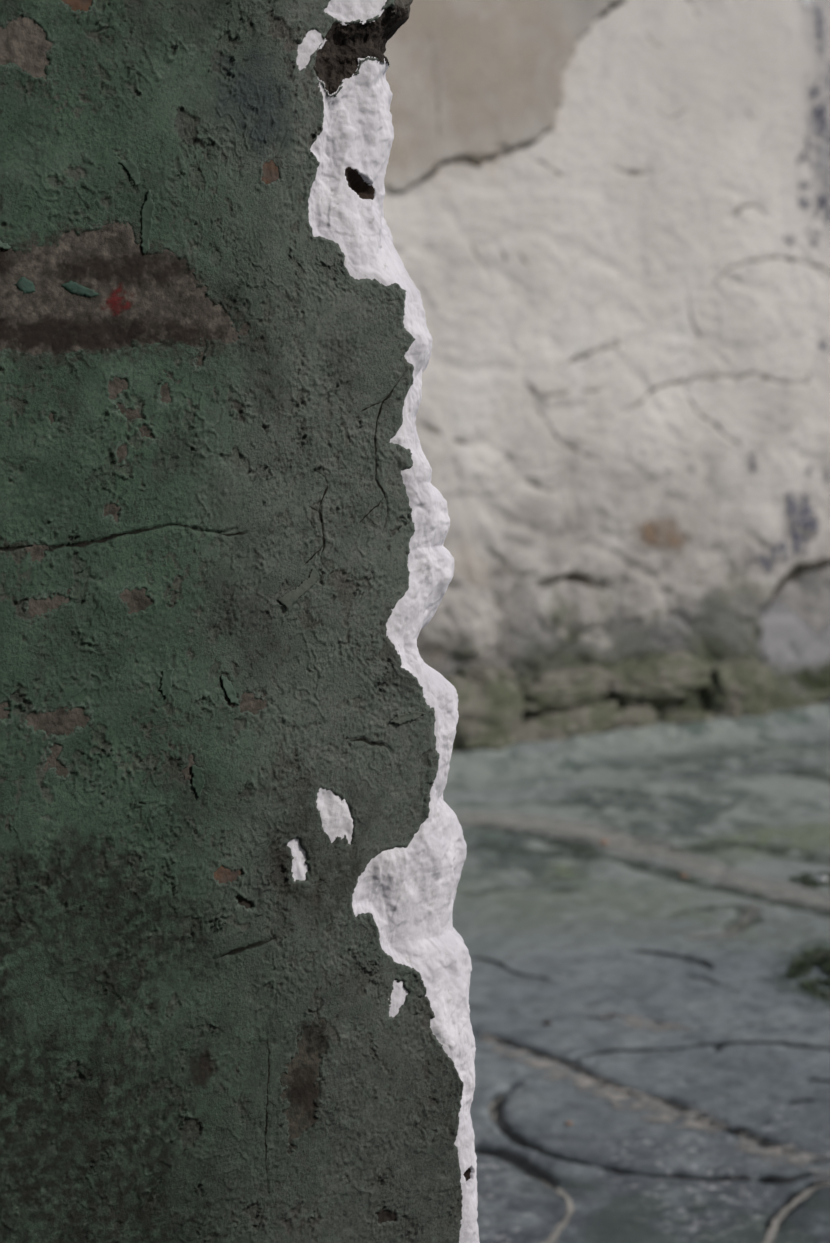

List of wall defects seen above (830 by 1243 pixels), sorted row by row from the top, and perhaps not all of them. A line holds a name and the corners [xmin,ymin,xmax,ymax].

peeling [0,16,52,79]
peeling [0,222,250,356]
crack [362,378,401,520]
crack [528,340,618,457]
crack [631,371,810,447]
crack [0,524,245,551]
crack [304,473,328,565]
flaking render [296,0,480,1243]
flaking render [287,838,308,881]
peeling [279,1018,328,1154]